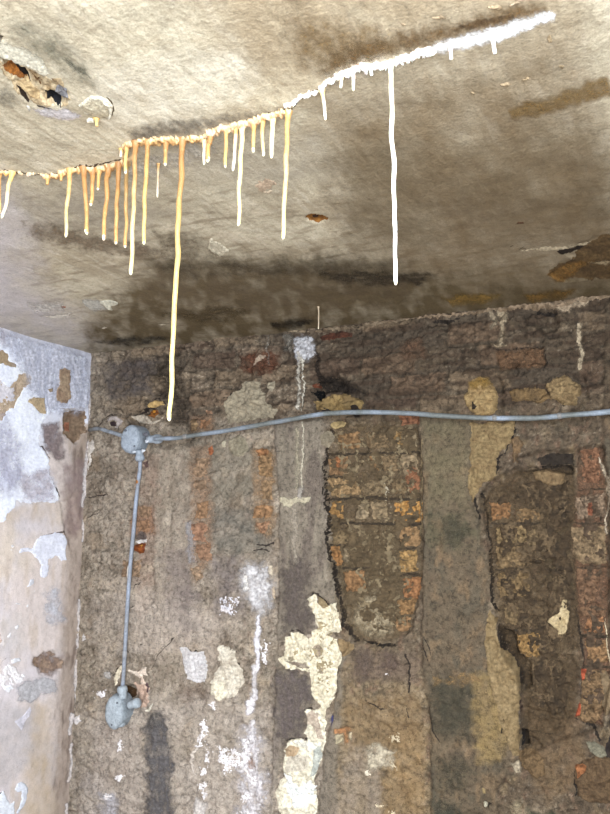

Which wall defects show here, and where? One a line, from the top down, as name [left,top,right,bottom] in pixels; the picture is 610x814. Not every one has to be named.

flaking render [0,35,79,120]
crack [0,12,555,180]
leakage [300,4,545,74]
leakage [34,226,240,267]
peeling [522,234,610,282]
flaking render [288,295,610,341]
peeling [0,331,90,522]
leakage [156,365,194,439]
leakage [271,320,316,410]
leakage [189,424,314,814]
flaking render [275,350,424,814]
flaking render [473,446,609,779]